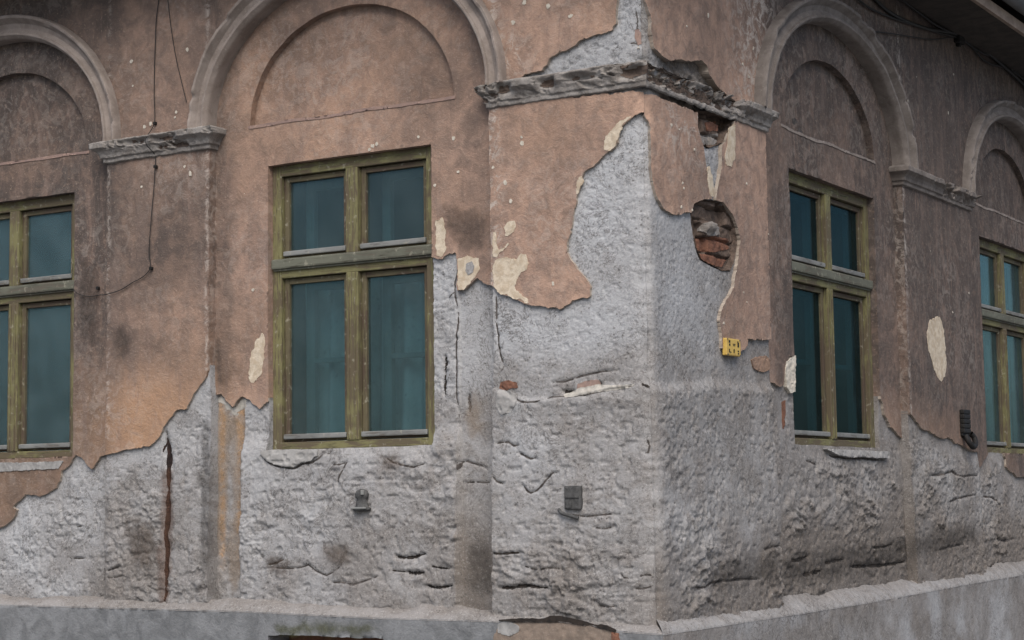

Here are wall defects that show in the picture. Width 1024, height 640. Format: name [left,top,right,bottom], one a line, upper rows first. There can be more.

spalling [526,0,714,114]
peeling [435,217,446,257]
spalling [0,253,519,610]
crack [449,269,460,417]
crack [496,296,504,371]
spalling [491,113,1024,632]